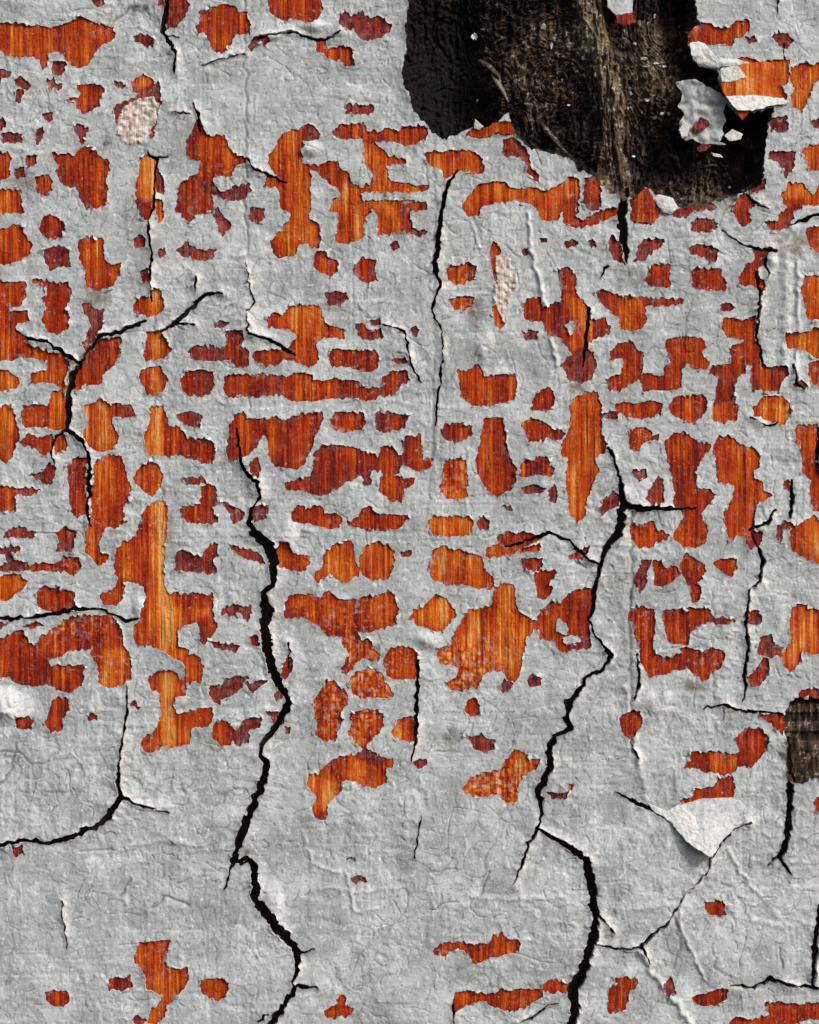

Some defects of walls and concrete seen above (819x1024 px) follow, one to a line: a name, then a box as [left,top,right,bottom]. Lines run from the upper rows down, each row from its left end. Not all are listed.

peeling [158,0,271,54]
crack [26,152,223,527]
peeling [0,8,819,820]
crack [380,170,458,426]
crack [0,686,170,847]
crack [224,428,318,1024]
crack [504,447,749,1024]
peeling [648,713,785,857]
crack [703,479,796,875]
peeling [107,938,229,1024]
peeling [451,978,568,1012]
peeling [729,1000,819,1024]